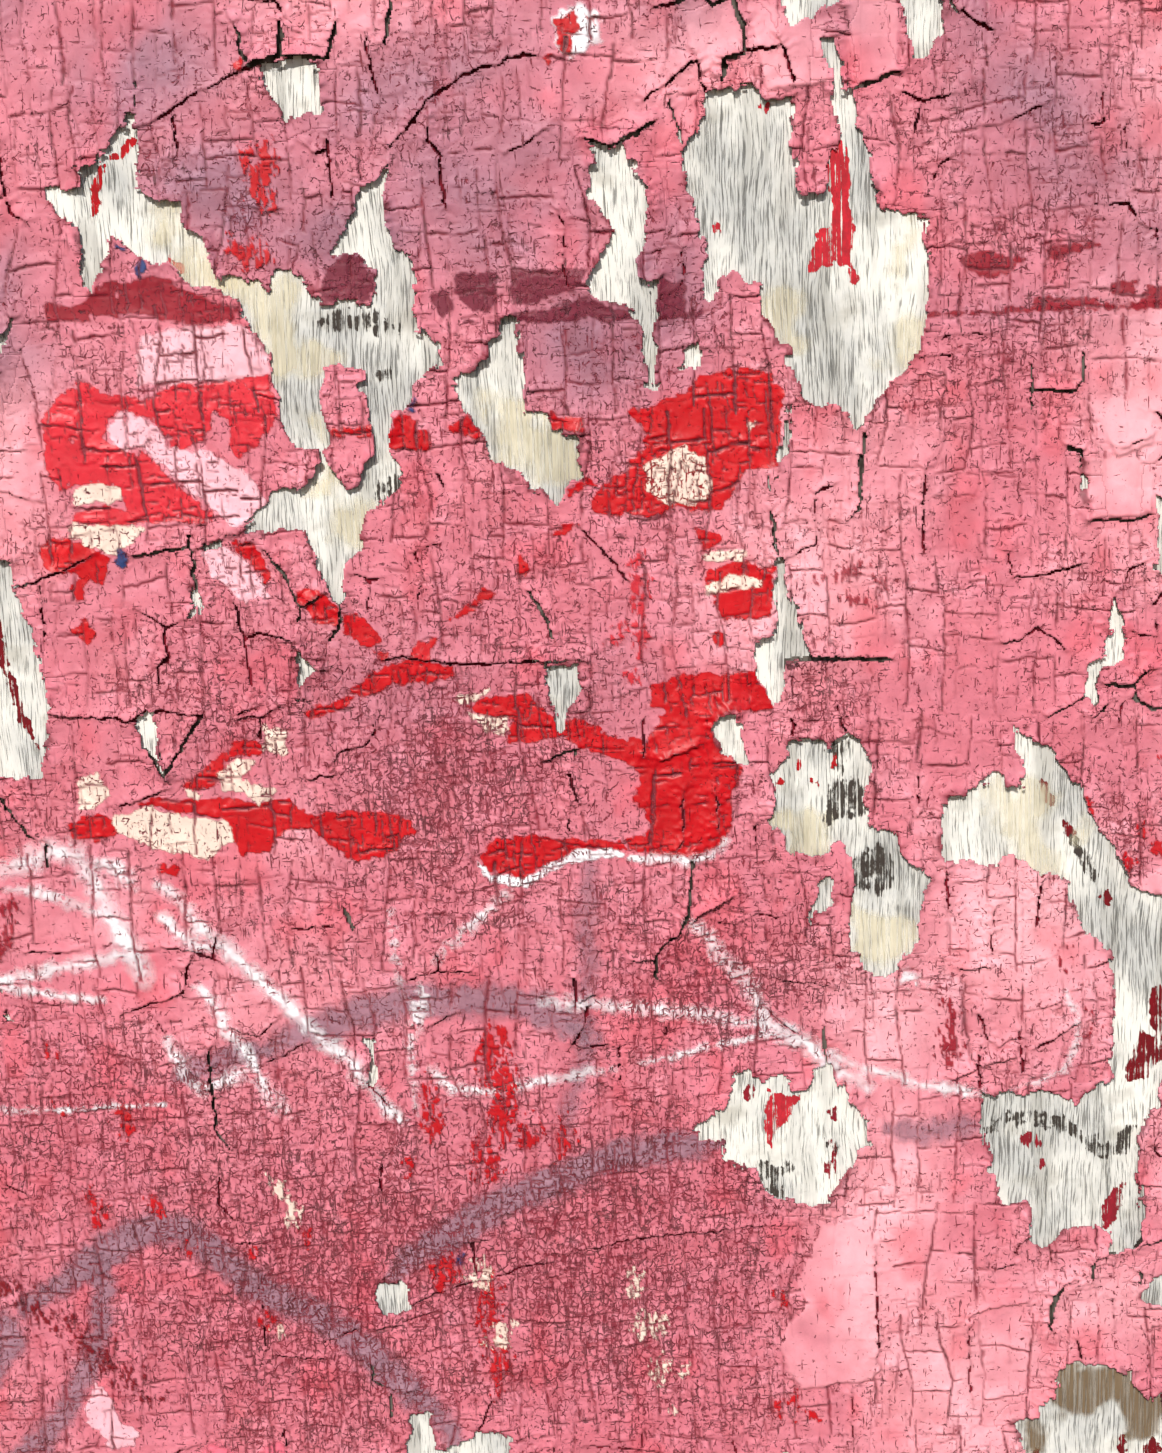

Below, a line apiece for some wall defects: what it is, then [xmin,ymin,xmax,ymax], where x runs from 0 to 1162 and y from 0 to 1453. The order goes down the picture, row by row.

crack [135,0,393,148]
peeling [233,38,338,142]
crack [584,0,796,150]
crack [862,71,951,133]
peeling [564,0,949,506]
peeling [45,81,600,640]
crack [767,423,867,562]
crack [48,535,379,807]
crack [1050,563,1162,723]
peeling [77,692,234,860]
peeling [677,542,1162,1322]
peeling [994,1348,1162,1453]